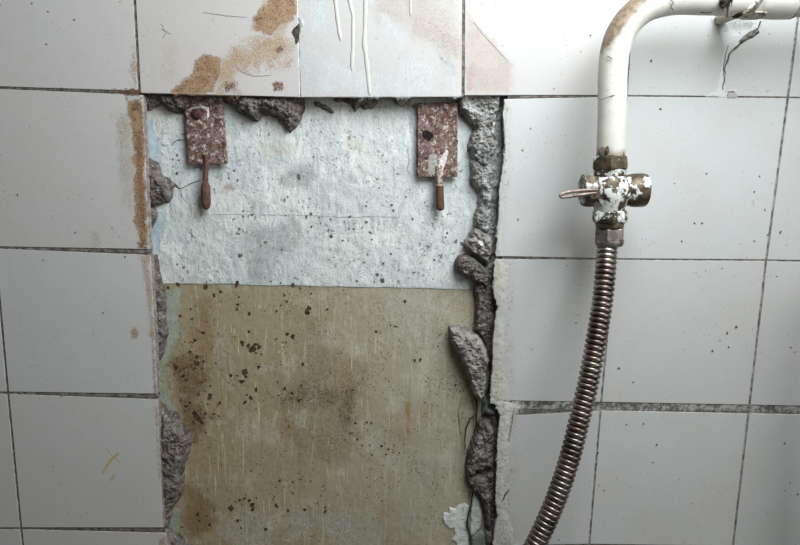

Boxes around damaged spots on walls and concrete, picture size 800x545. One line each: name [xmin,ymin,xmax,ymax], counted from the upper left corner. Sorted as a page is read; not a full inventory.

rust [158,0,297,100]
damp [360,0,516,100]
crack [700,12,761,89]
spalling [224,96,381,133]
spalling [395,98,412,107]
rust [109,37,157,392]
spalling [144,94,221,545]
rust [166,293,220,446]
peeling [240,332,295,355]
spalling [442,95,506,545]
damp [209,506,387,545]